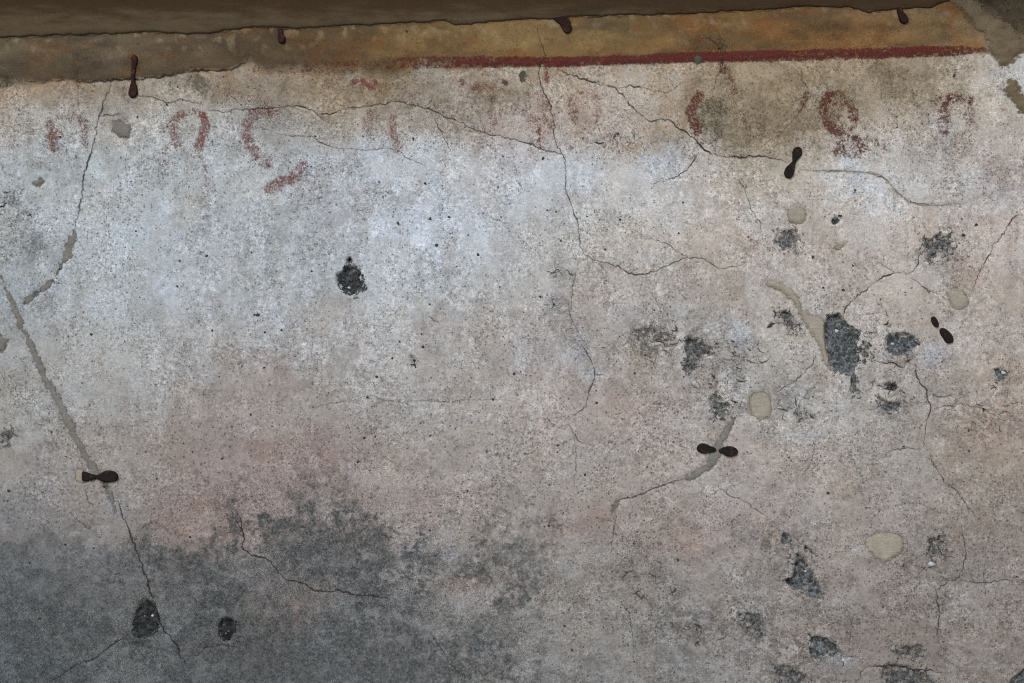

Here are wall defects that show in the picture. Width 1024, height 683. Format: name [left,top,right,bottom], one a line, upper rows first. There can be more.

spalling [336,258,368,299]
crack [19,28,818,489]
crack [844,251,936,313]
spalling [917,218,965,266]
spalling [627,309,769,423]
spalling [823,310,920,422]
crack [118,502,240,665]
leakage [126,493,509,683]
crack [234,510,412,624]
leakage [466,518,545,607]
spalling [780,532,825,602]
crack [860,359,1024,676]